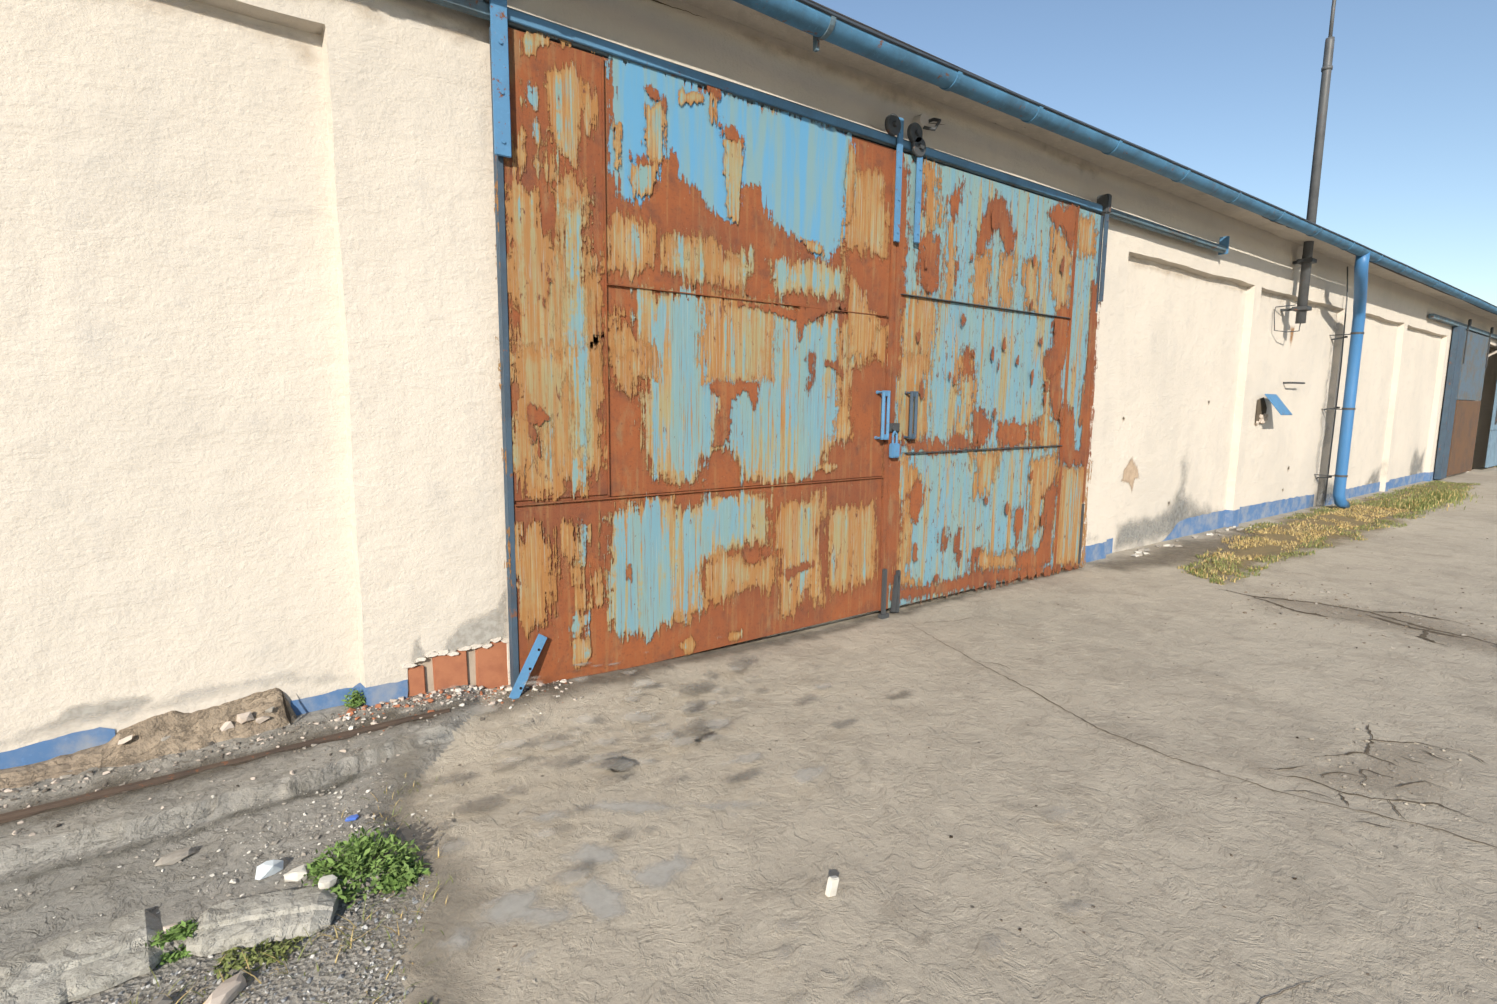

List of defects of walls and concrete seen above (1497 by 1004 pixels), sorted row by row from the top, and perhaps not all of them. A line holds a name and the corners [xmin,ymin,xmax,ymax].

rust [643,83,668,114]
rust [885,157,1018,381]
peeling [402,31,891,714]
rust [709,377,760,448]
rust [729,299,846,397]
rust [877,277,1101,604]
peeling [1122,459,1138,489]
leakage [1119,499,1202,545]
spalling [614,628,755,745]
crack [897,615,1496,847]
spalling [455,792,513,813]
crack [1259,971,1337,1004]